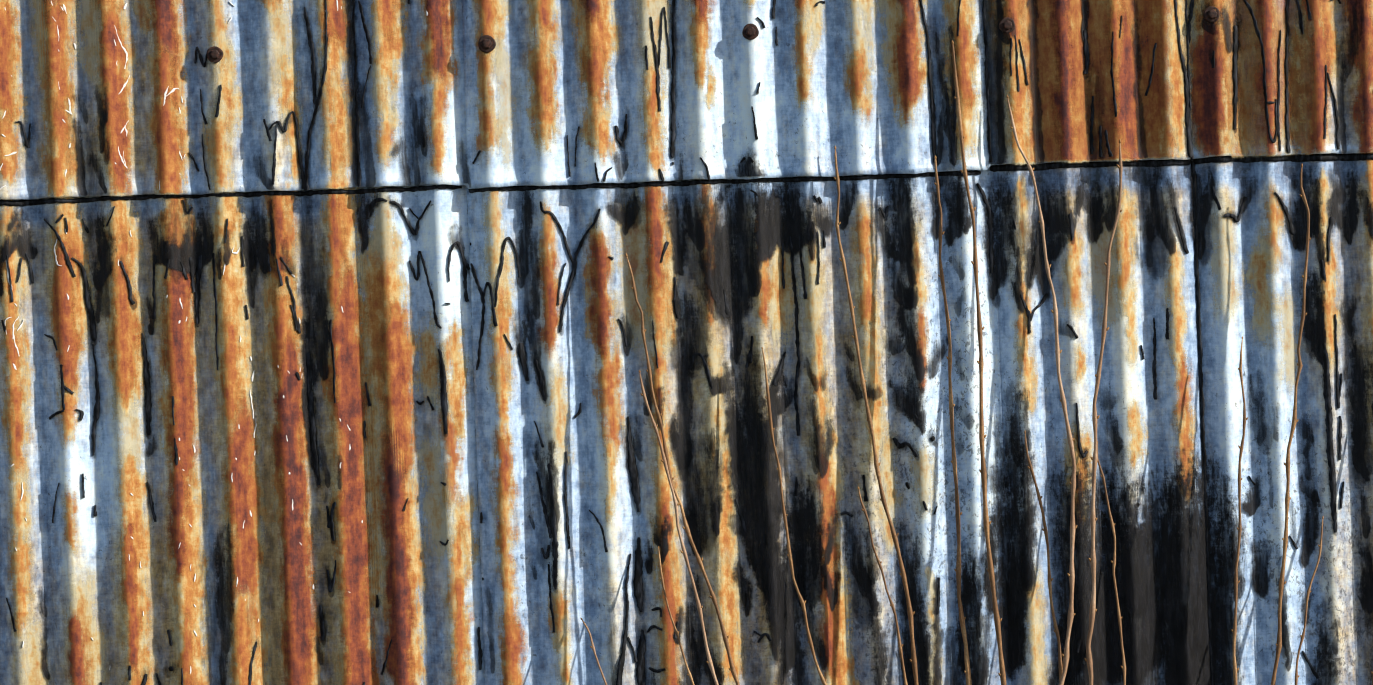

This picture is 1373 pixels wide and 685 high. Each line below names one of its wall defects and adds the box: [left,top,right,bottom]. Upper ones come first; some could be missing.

rust [474,0,620,163]
rust [0,0,528,685]
damp [483,237,521,326]
damp [557,209,601,332]
rust [583,0,684,685]
rust [707,344,744,685]
damp [781,230,826,436]
rust [754,217,859,685]
damp [976,183,994,273]
damp [1020,293,1048,333]
rust [845,0,1373,412]
damp [1322,343,1342,532]